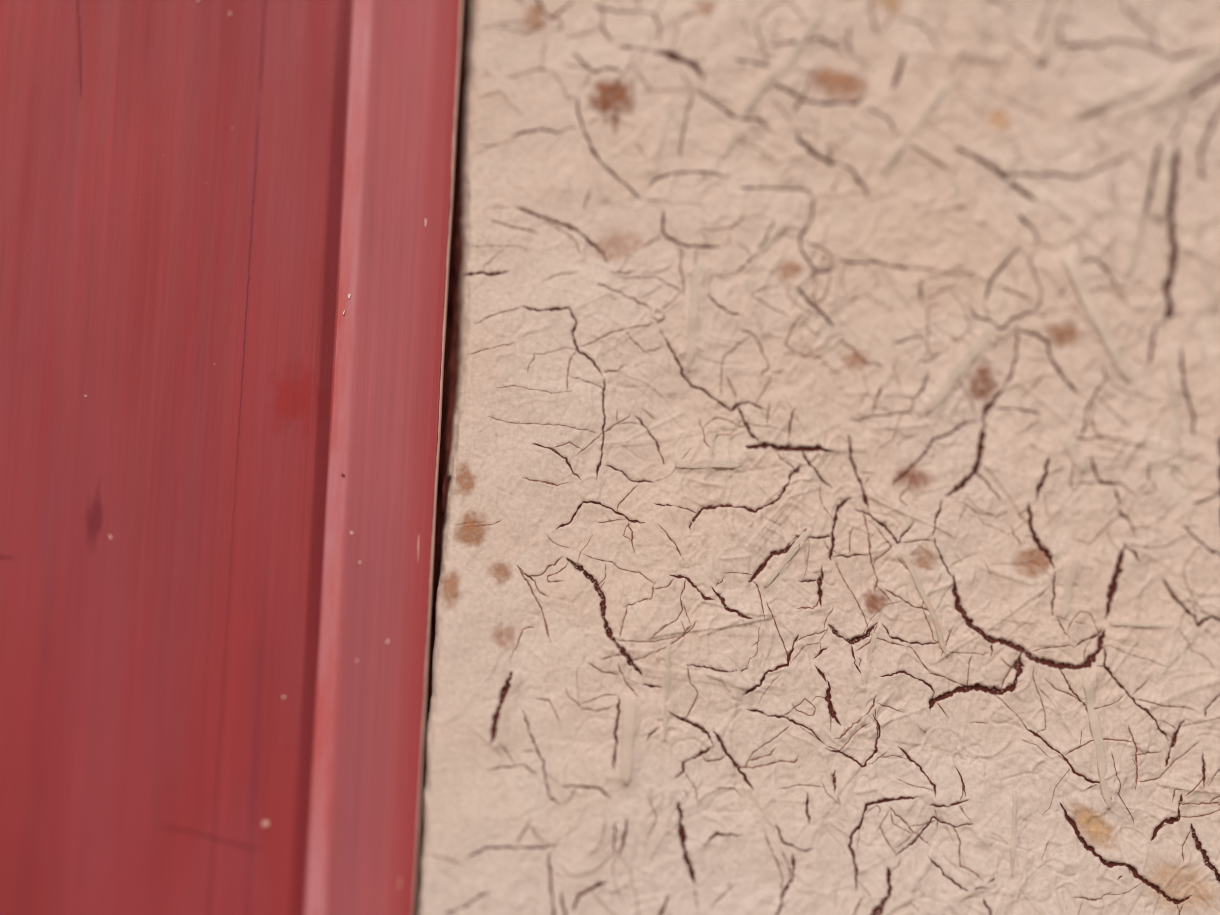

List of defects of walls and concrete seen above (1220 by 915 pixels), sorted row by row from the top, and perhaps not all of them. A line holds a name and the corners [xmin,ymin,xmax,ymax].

crack [415,0,1220,915]